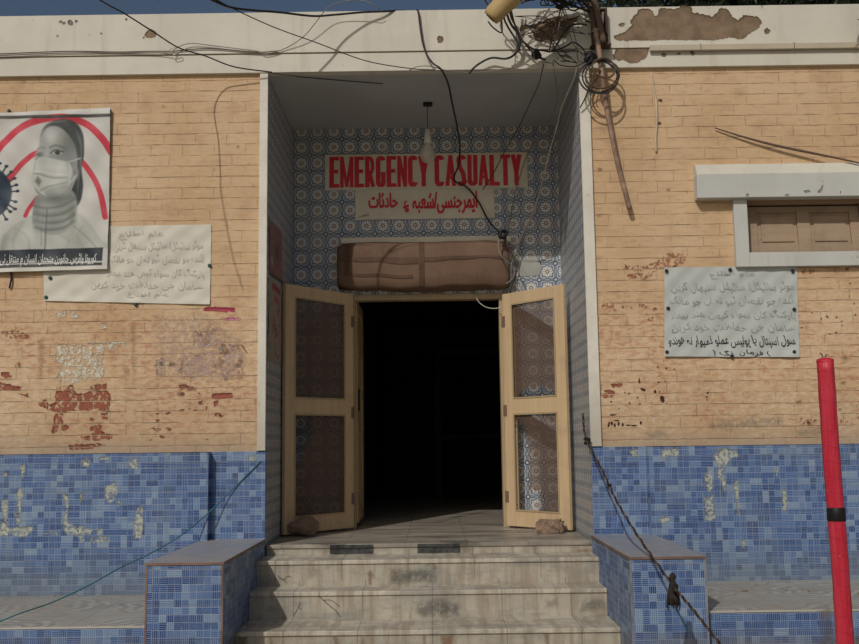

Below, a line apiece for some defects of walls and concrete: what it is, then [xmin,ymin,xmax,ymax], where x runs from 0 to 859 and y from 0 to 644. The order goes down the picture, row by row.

spalling [613,5,771,63]
peeling [622,253,685,280]
peeling [0,362,28,397]
peeling [38,341,126,450]
peeling [15,464,25,524]
peeling [704,469,716,521]
peeling [133,506,143,538]